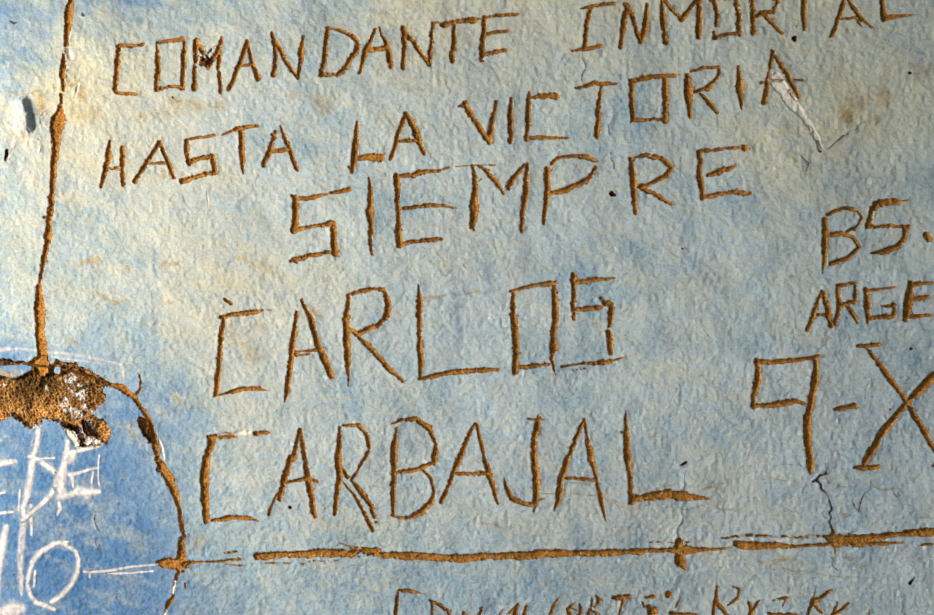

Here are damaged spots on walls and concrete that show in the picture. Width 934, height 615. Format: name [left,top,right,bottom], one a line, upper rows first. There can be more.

flaking render [0,355,111,450]
crack [812,463,871,534]